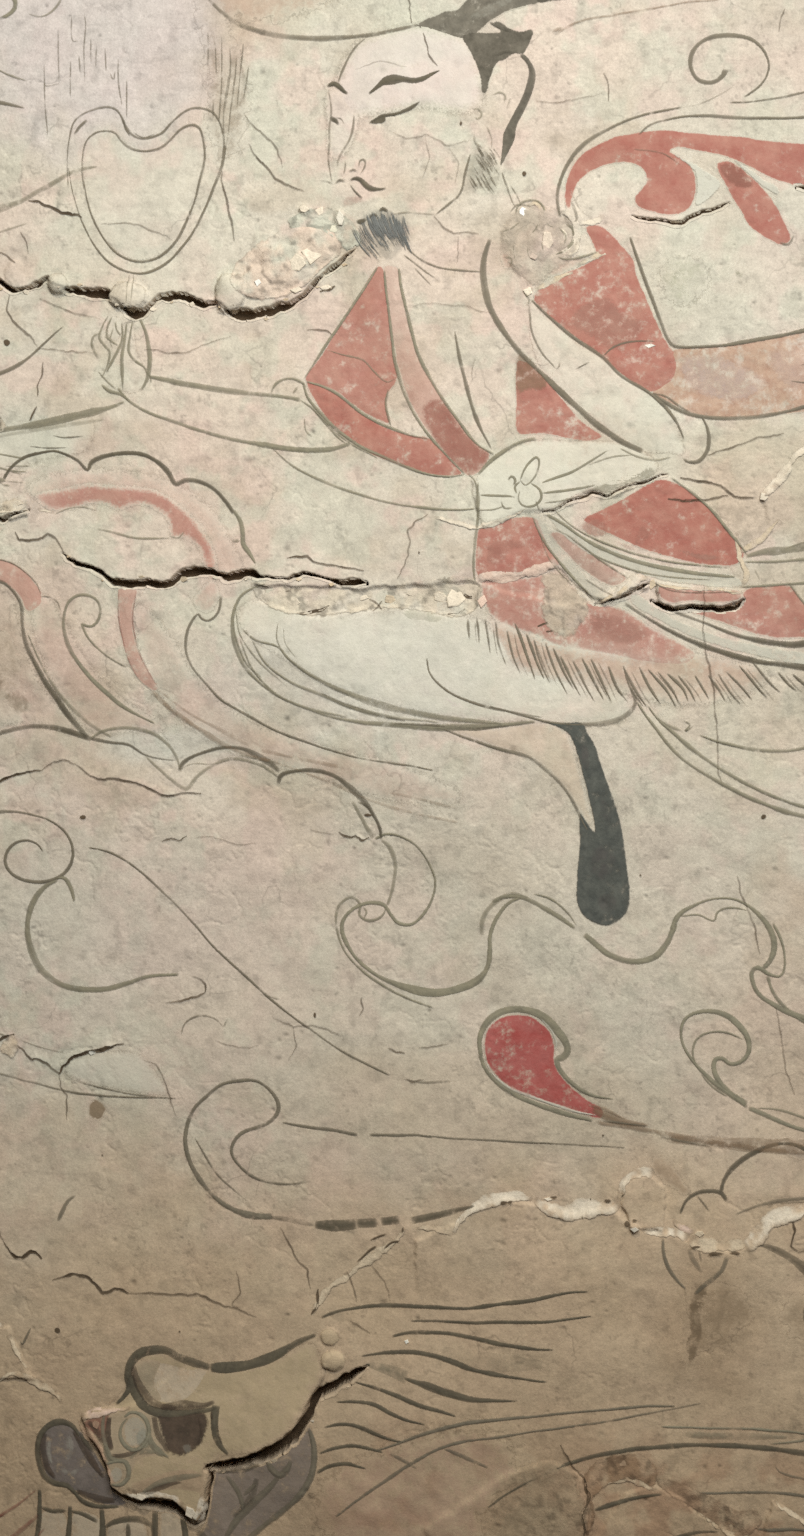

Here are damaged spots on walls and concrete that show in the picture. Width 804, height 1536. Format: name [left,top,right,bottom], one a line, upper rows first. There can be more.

crack [28,200,82,217]
flaking render [230,205,361,301]
crack [0,246,358,354]
crack [0,351,71,421]
spalling [760,447,804,501]
crack [0,509,382,615]
spalling [251,520,778,638]
crack [595,582,745,614]
crack [0,1034,124,1107]
crack [280,1227,405,1315]
crack [790,1222,802,1252]
crack [114,1365,369,1529]